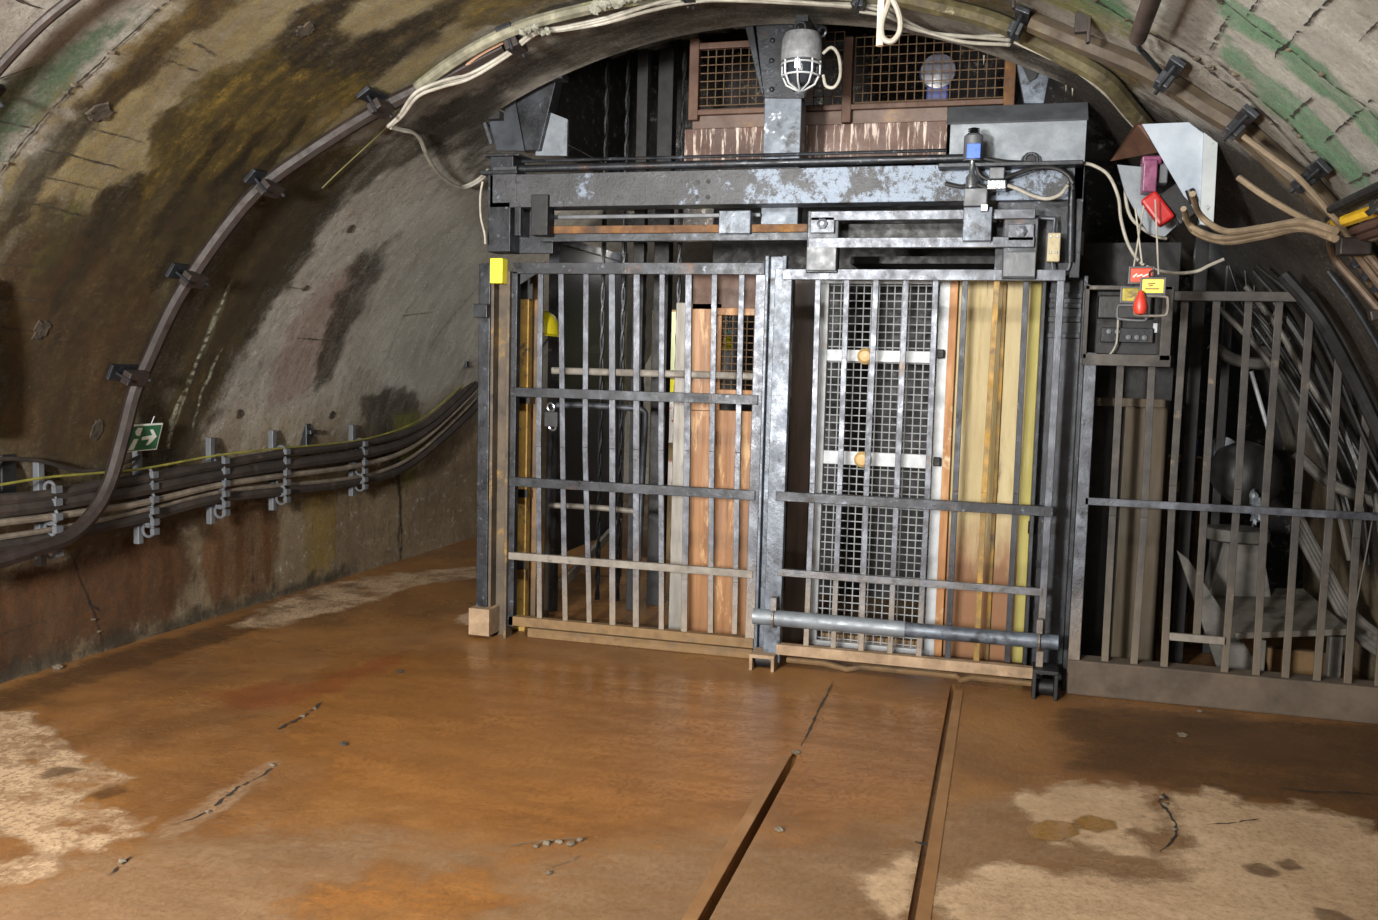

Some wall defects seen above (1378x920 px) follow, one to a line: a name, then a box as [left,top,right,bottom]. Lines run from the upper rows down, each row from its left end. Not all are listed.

leakage [0,0,1073,484]
leakage [163,568,345,632]
crack [172,701,322,825]
crack [1158,793,1177,851]
crack [109,855,132,875]